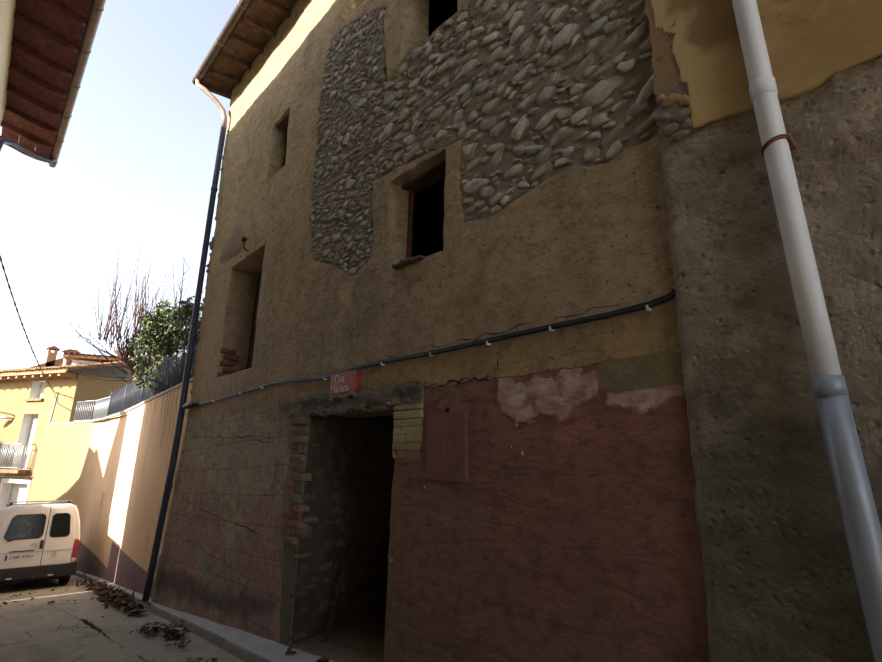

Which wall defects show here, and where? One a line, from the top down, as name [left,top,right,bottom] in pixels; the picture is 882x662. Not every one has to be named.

water stain [654,0,743,65]
water stain [756,0,800,41]
flaking render [645,0,701,150]
peeling [494,366,687,427]